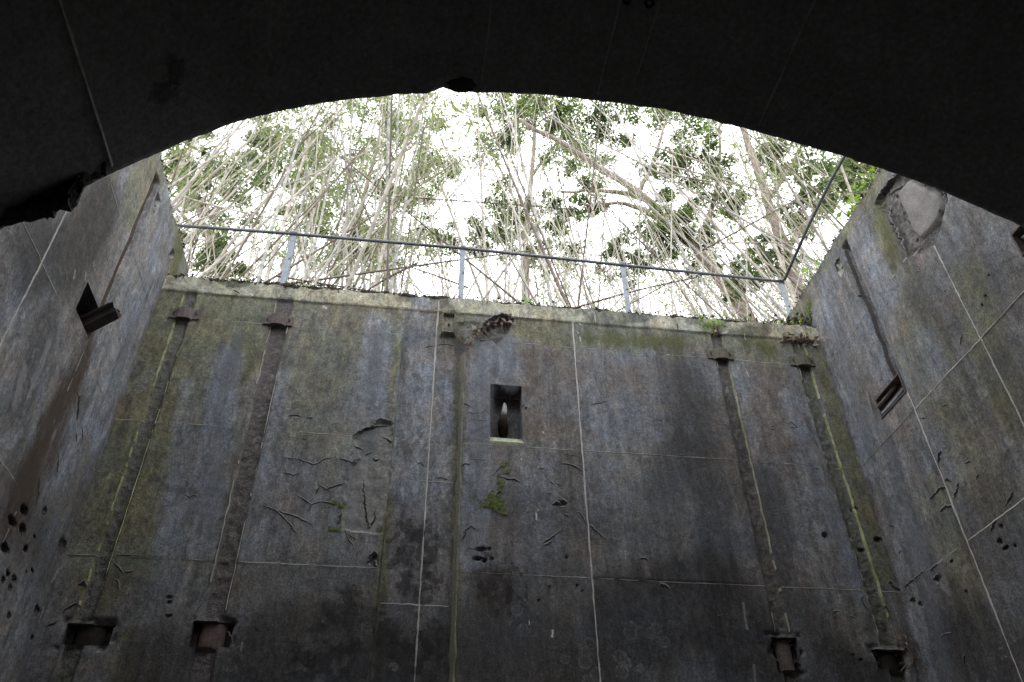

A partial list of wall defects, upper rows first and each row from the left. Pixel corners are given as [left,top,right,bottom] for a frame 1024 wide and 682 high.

spalling [874,174,948,258]
spalling [457,312,514,344]
water stain [12,340,51,411]
crack [261,414,363,546]
crack [417,452,583,494]
spalling [7,505,36,552]
crack [543,511,608,546]